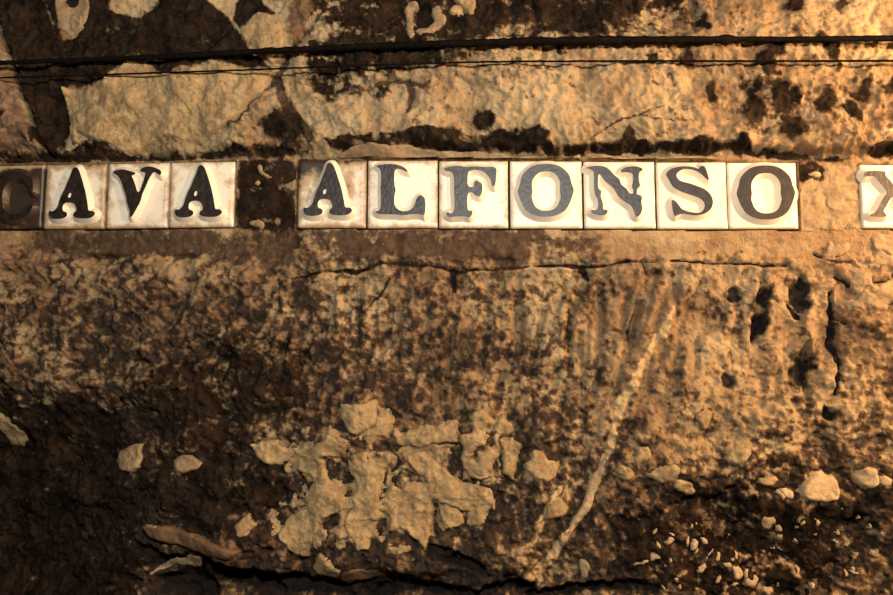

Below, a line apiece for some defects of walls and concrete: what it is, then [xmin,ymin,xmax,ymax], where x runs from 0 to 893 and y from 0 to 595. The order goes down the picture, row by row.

crack [143,544,660,595]